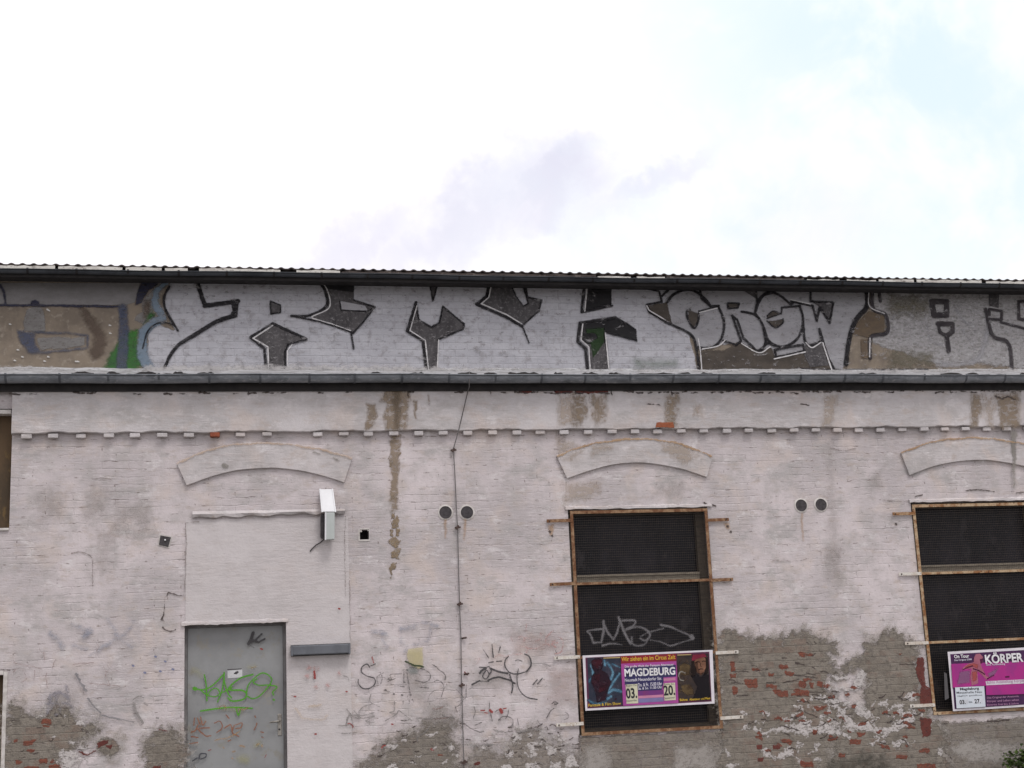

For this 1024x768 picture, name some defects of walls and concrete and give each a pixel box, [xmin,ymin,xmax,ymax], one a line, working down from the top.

water stain [365,391,417,578]
water stain [561,395,606,424]
water stain [971,393,1019,487]
spalling [0,699,194,768]
spalling [356,623,1024,768]